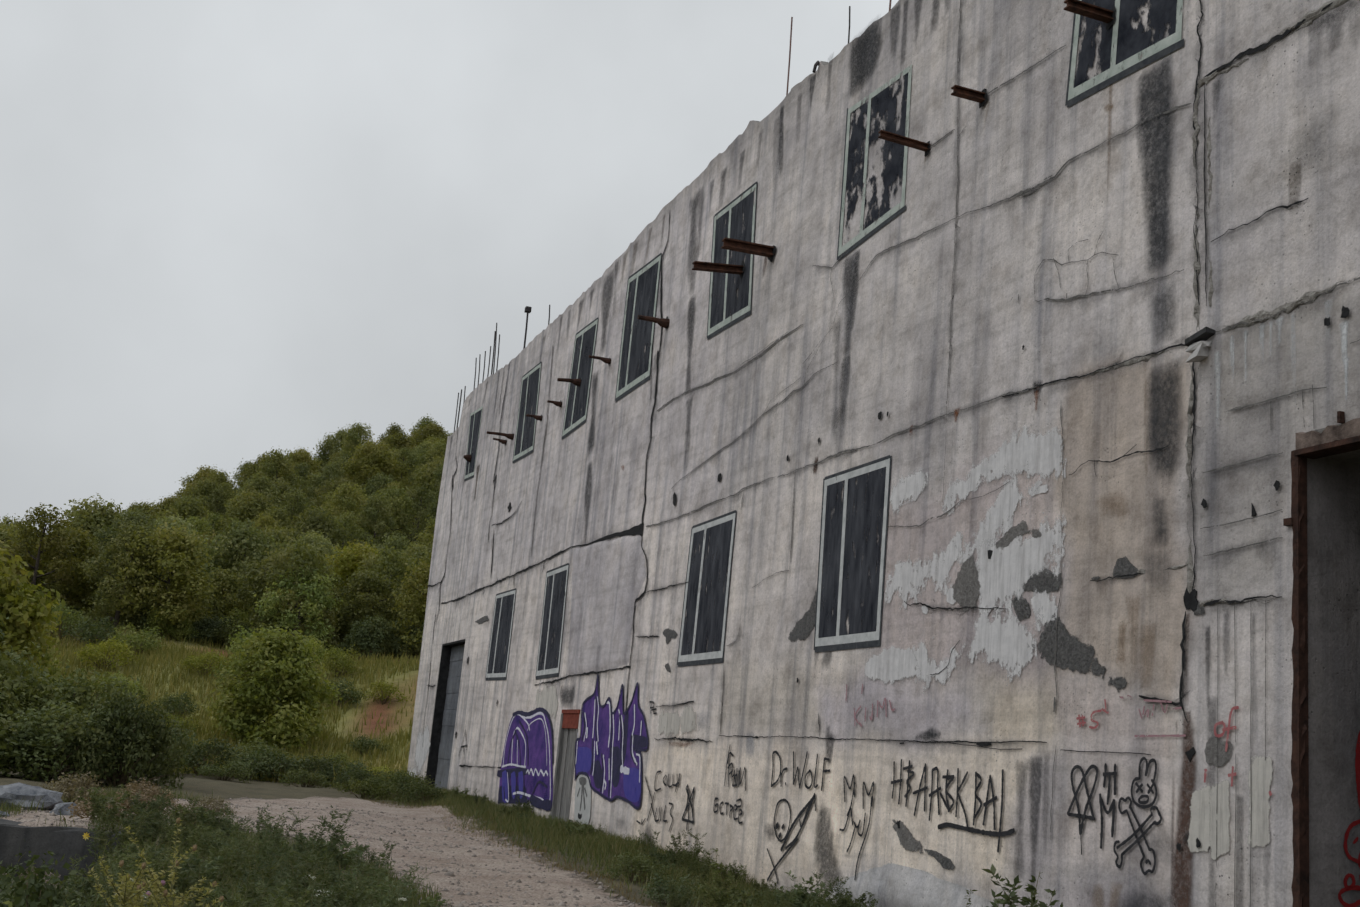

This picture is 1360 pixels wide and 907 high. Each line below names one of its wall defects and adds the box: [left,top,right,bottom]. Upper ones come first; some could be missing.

water stain [850,0,938,91]
water stain [1139,61,1171,266]
water stain [845,253,859,342]
crack [423,0,1360,907]
water stain [1150,371,1178,474]
peeling [864,424,1128,693]
spalling [1091,556,1138,580]